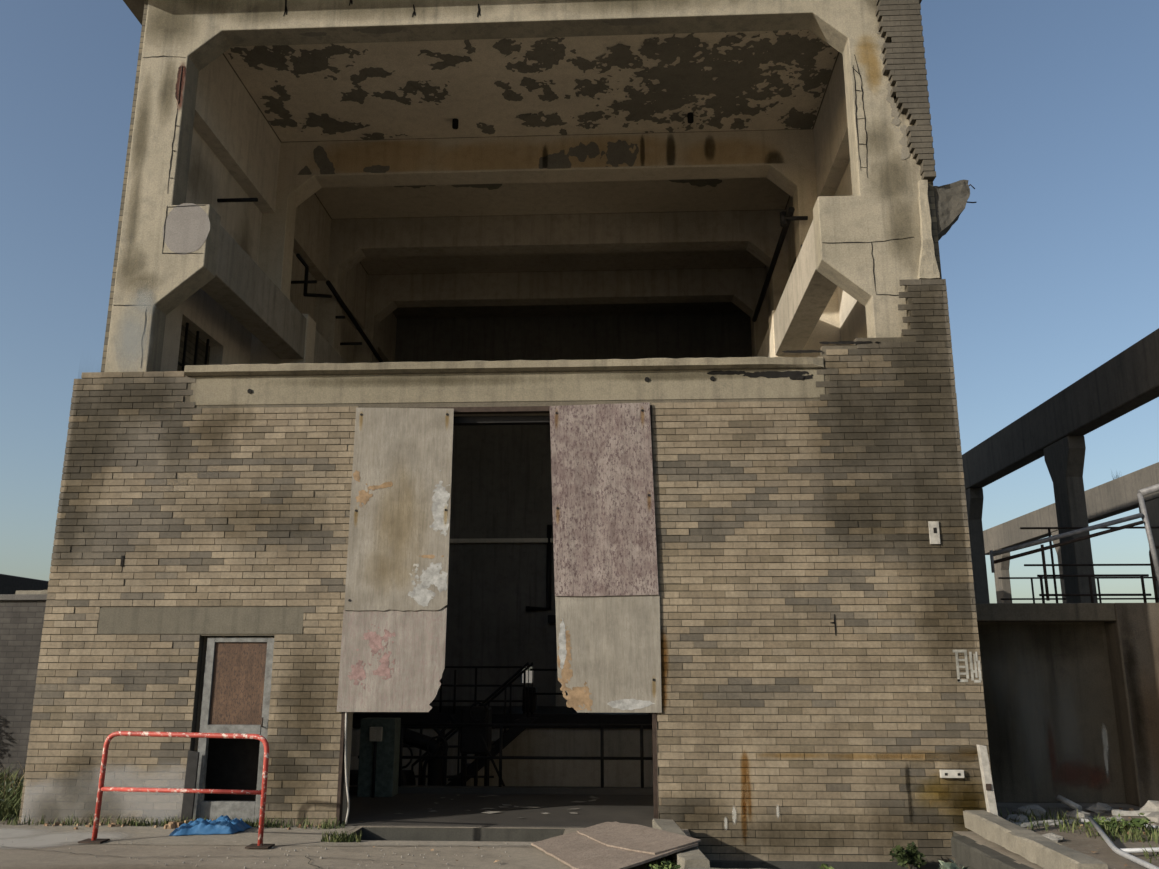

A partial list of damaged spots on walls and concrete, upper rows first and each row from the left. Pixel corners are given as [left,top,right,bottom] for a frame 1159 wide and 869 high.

peeling [353,26,402,34]
peeling [228,32,476,175]
peeling [493,18,836,169]
crack [162,108,204,254]
crack [822,237,912,296]
crack [114,305,147,366]
peeling [429,469,450,536]
peeling [408,555,448,607]